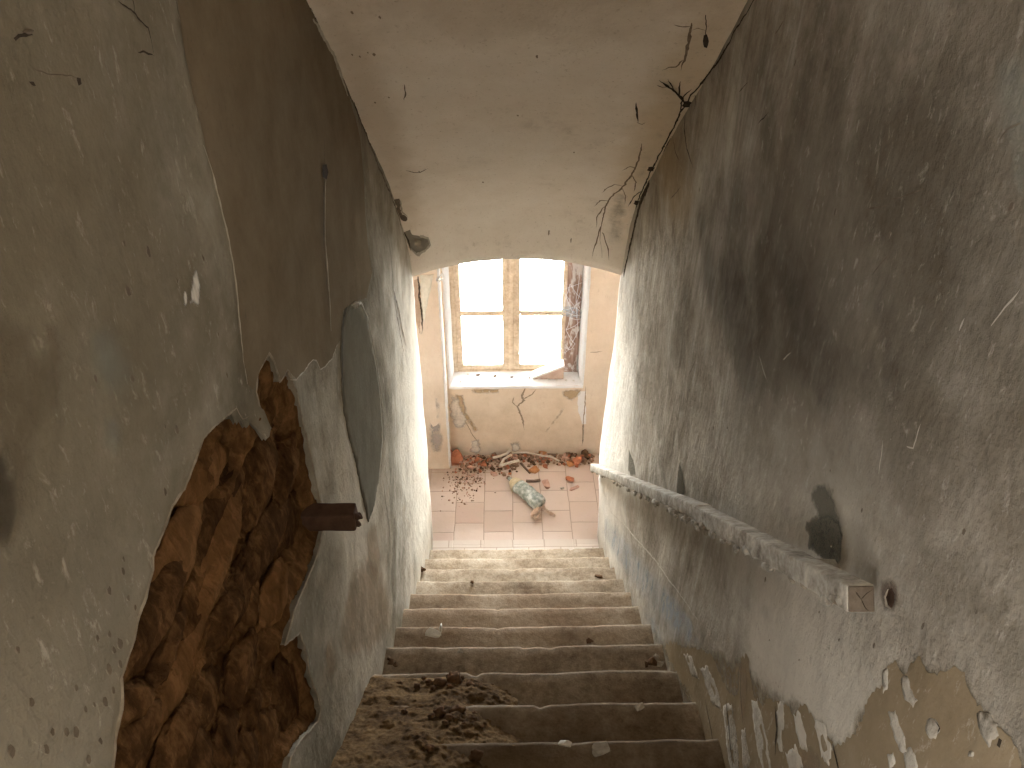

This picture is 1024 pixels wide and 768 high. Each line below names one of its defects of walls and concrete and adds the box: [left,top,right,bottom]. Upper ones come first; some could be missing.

crack [592,0,754,276]
flaking render [394,199,431,256]
flaking render [83,0,372,768]
crack [512,388,535,427]
peeling [662,641,1022,768]